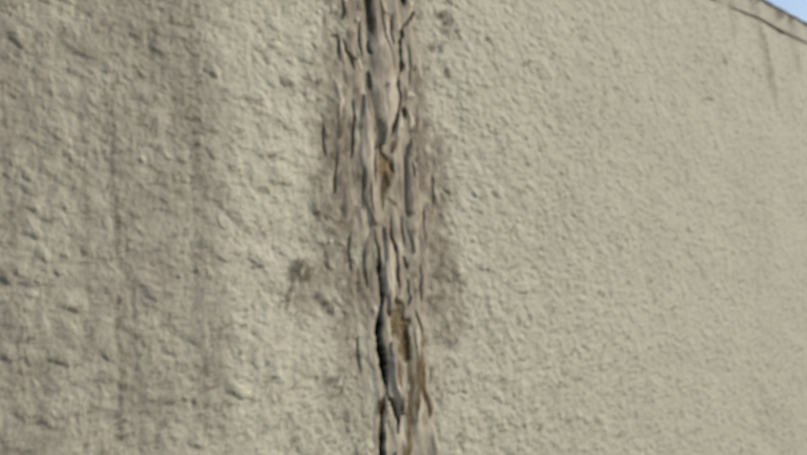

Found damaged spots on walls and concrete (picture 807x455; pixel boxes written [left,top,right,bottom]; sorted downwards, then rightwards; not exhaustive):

crack [348,100,356,158]
crack [330,0,414,138]
crack [347,221,423,455]